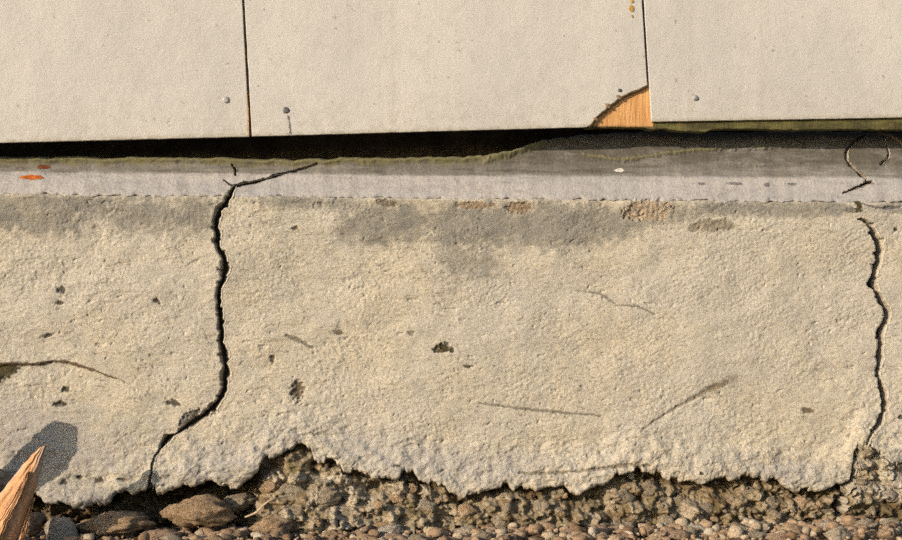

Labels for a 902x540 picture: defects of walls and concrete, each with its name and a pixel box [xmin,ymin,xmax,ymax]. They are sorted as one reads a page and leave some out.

spalling [588,85,648,129]
rust [20,165,50,180]
leakage [350,204,642,246]
crack [149,164,316,489]
crack [830,136,901,518]
crack [0,359,124,382]
spalling [32,443,902,537]